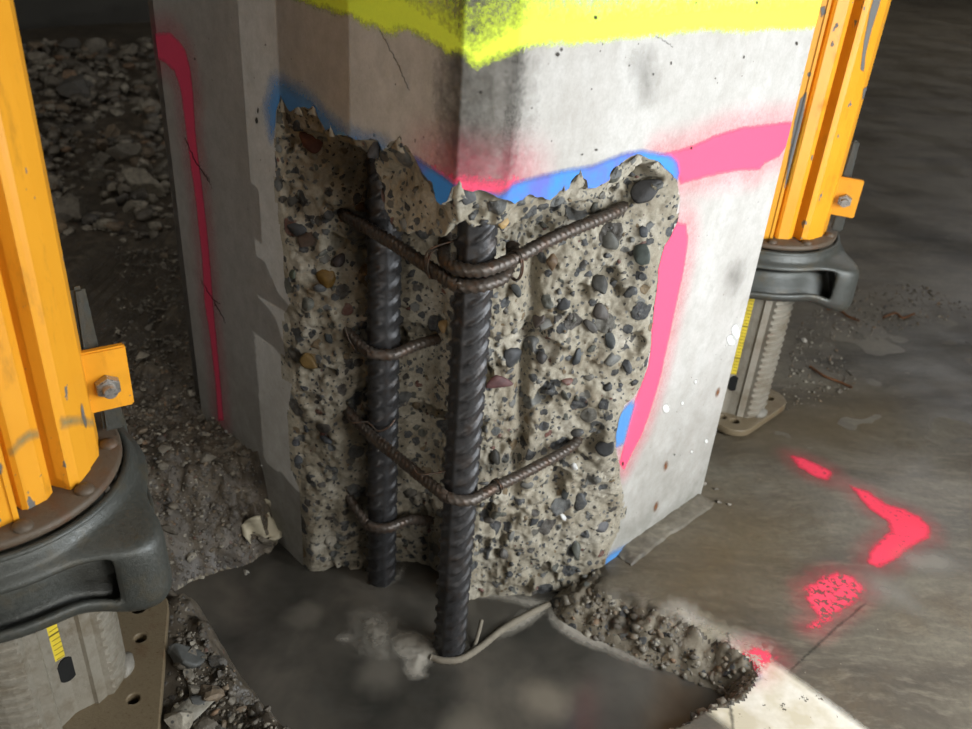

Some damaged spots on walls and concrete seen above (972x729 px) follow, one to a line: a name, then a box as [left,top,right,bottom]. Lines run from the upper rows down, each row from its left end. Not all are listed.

spalling [178,541,278,589]
spalling [273,95,756,729]